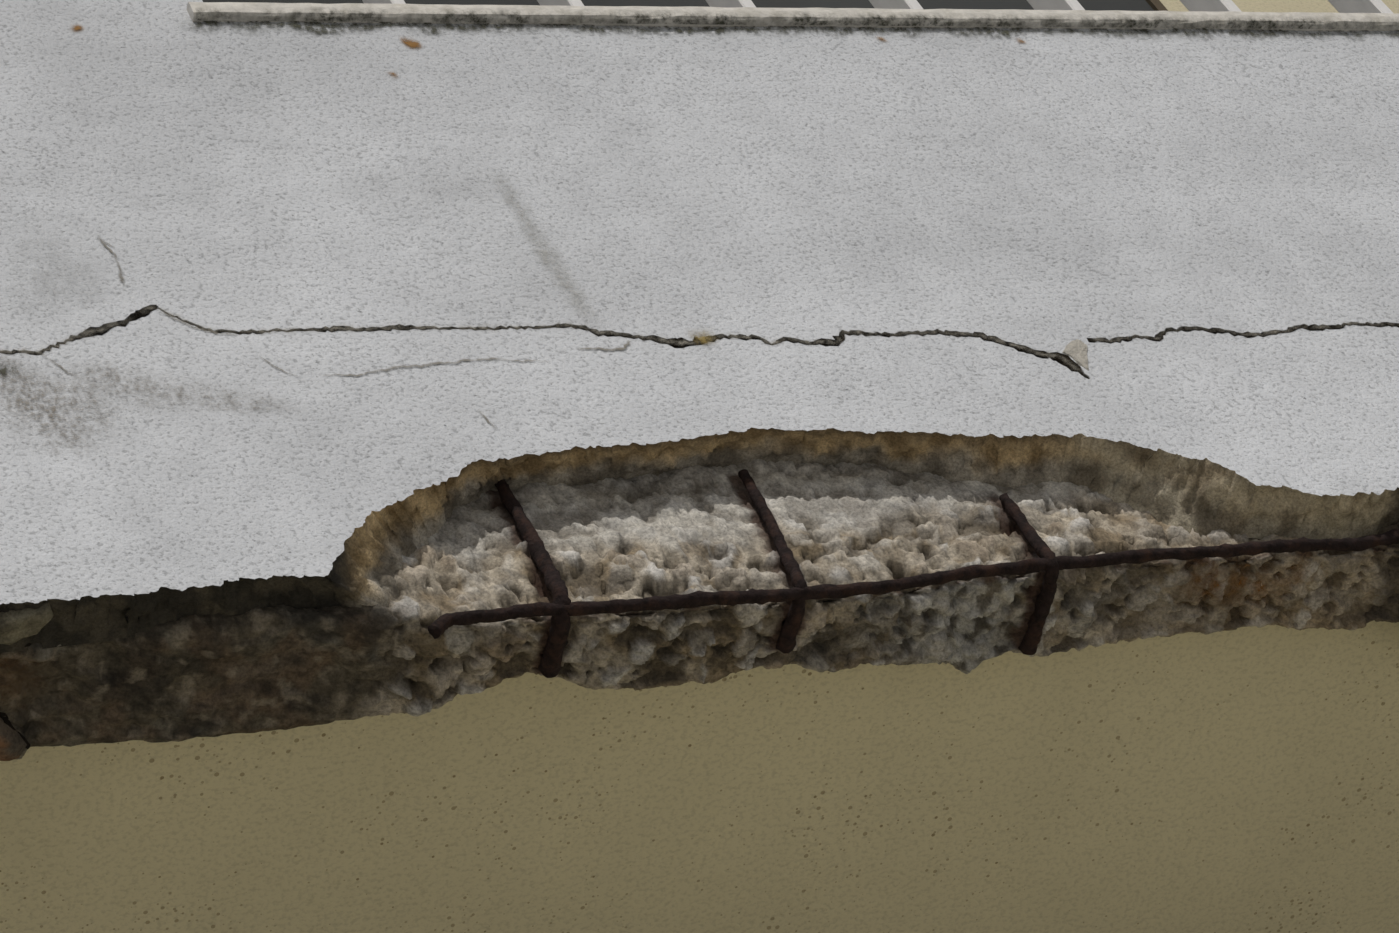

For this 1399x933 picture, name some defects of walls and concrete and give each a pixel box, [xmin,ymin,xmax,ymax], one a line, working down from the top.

water stain [196,10,1399,37]
crack [0,240,1399,379]
spalling [0,427,1399,761]